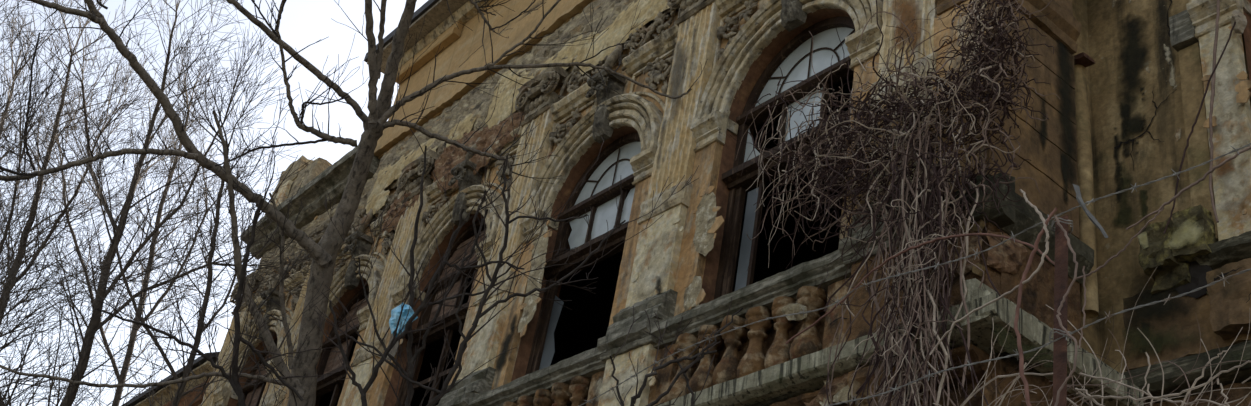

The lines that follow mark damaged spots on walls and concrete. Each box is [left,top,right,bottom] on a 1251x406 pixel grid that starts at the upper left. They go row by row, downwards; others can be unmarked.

spalling [354,0,671,238]
damp [1040,0,1094,202]
damp [1114,15,1148,202]
spalling [255,200,341,289]
peeling [631,185,725,297]
spalling [680,275,706,313]
damp [1081,315,1101,360]